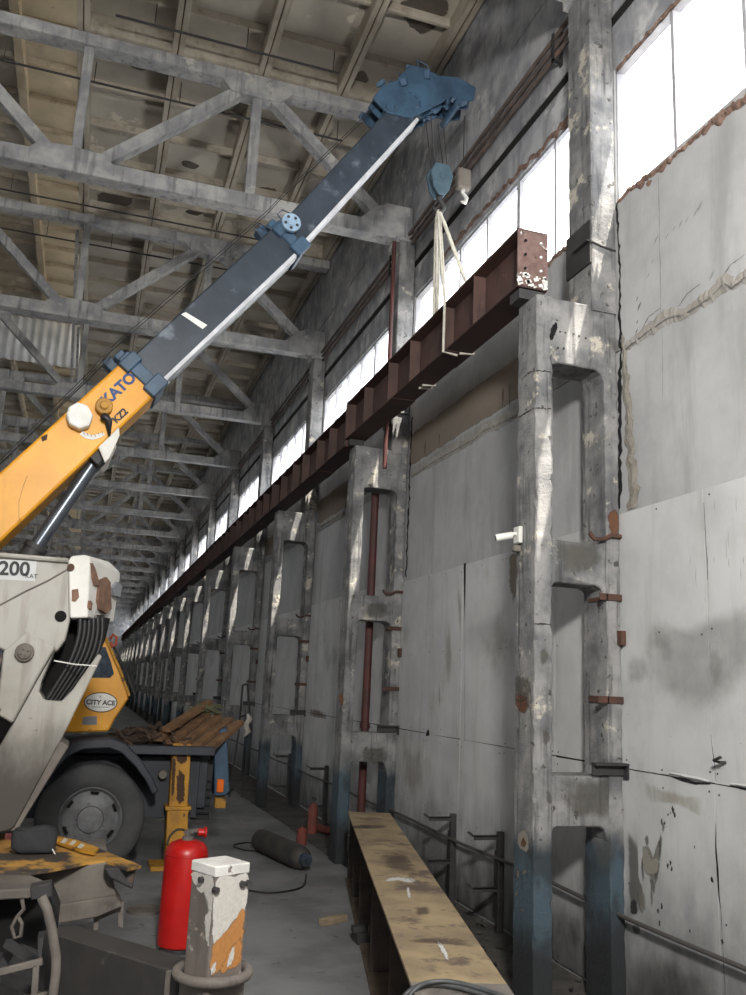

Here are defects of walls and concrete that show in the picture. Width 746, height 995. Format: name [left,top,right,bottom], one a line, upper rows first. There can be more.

spalling [617,93,746,203]
crack [615,202,641,510]
rust [608,511,619,534]
peeling [641,806,676,926]